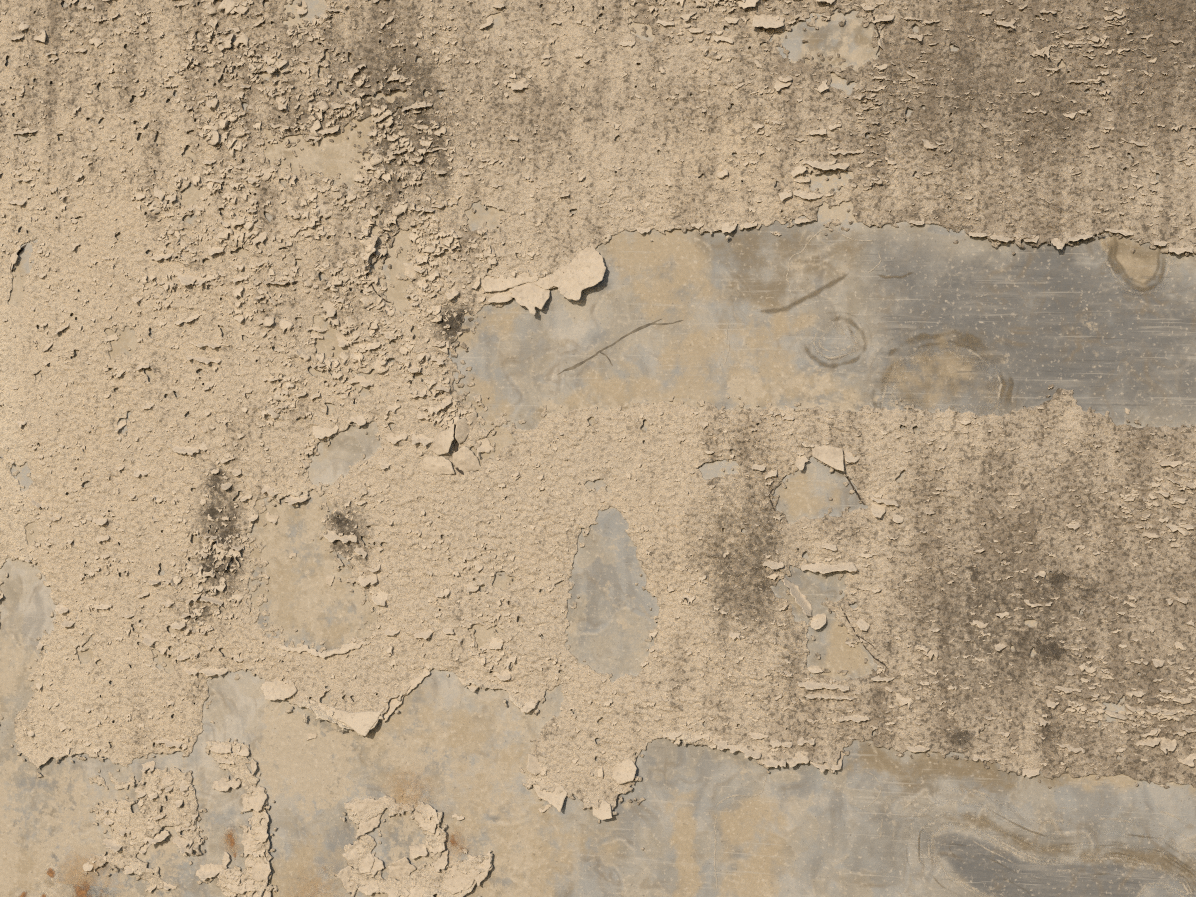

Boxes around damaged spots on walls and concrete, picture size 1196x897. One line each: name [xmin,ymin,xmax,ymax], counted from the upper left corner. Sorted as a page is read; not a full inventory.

peeling [964,9,1016,29]
peeling [1104,9,1126,20]
peeling [689,0,940,93]
peeling [1033,39,1111,83]
peeling [809,124,841,135]
peeling [1022,106,1087,119]
peeling [8,231,42,307]
peeling [177,261,294,288]
peeling [196,149,1196,682]
peeling [0,543,1196,897]